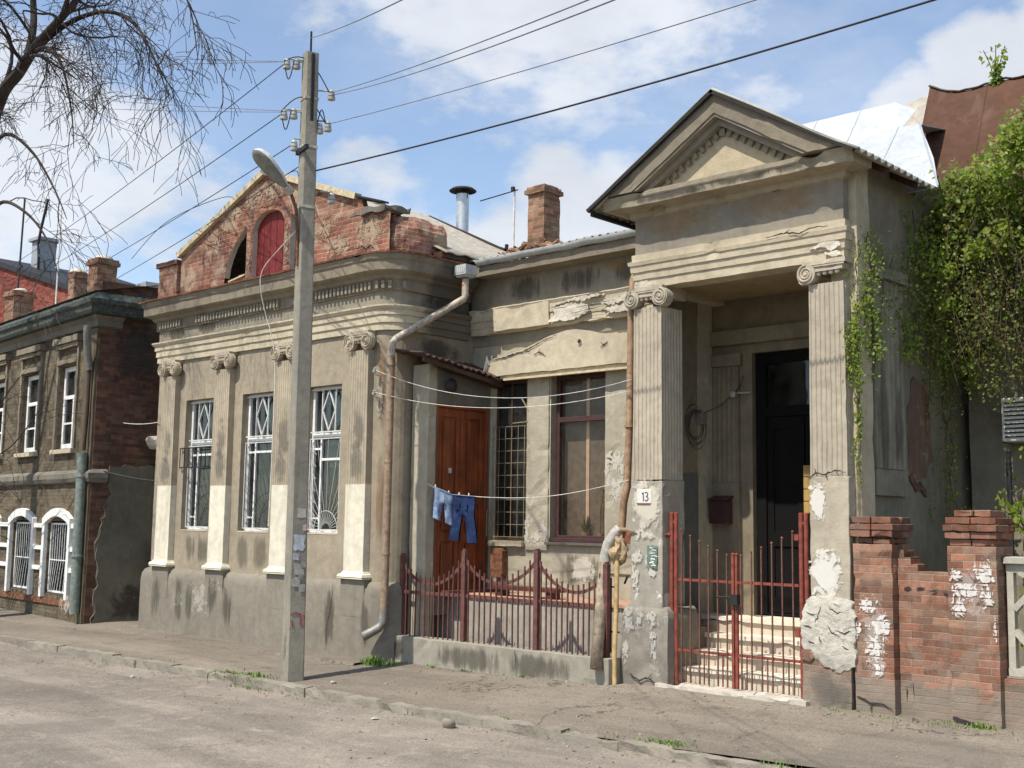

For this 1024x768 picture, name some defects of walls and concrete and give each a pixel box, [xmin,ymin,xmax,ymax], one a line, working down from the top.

peeling [314,214,385,255]
crack [766,226,825,238]
spalling [810,240,842,257]
spalling [548,280,658,323]
spalling [906,377,933,497]
peeling [604,450,660,590]
peeling [808,480,826,519]
peeling [809,548,843,596]
leakage [173,578,220,615]
peeling [949,558,997,642]
peeling [622,606,659,664]
peeling [856,594,892,676]